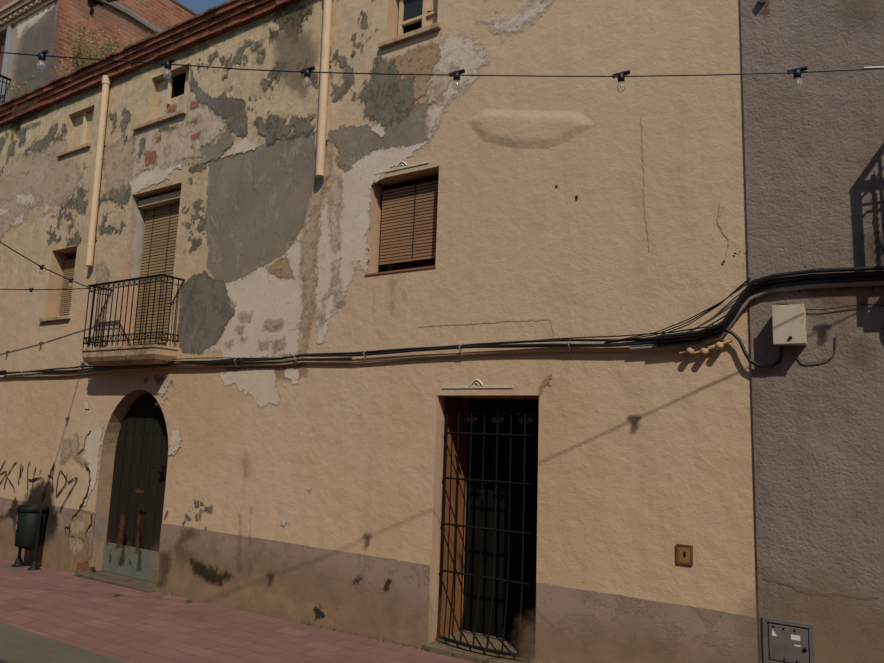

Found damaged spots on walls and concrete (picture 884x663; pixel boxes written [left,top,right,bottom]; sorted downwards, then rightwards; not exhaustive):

peeling [329,10,382,104]
flaking render [475,0,554,40]
flaking render [0,138,87,241]
flaking render [103,39,278,287]
flaking render [208,30,490,407]
flaking render [60,424,104,572]
flaking render [168,427,182,455]
water stain [158,531,423,647]